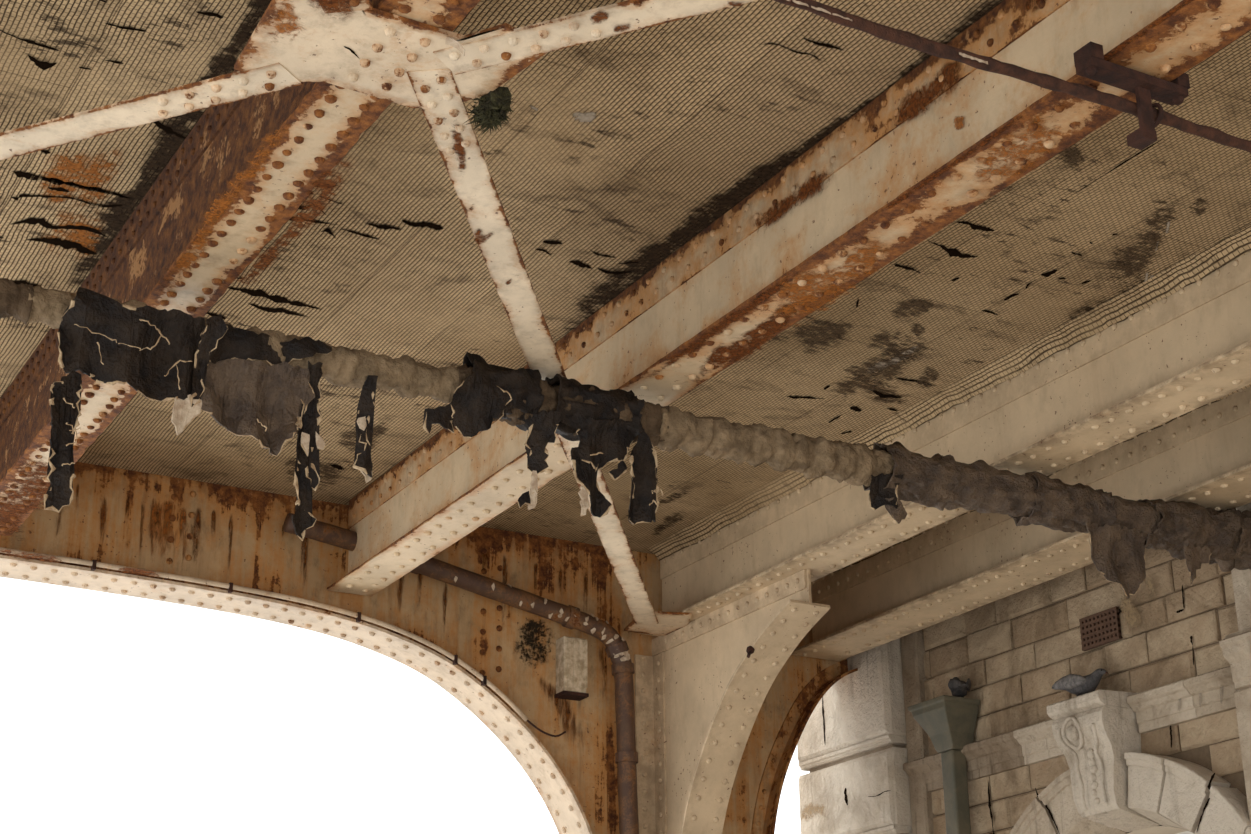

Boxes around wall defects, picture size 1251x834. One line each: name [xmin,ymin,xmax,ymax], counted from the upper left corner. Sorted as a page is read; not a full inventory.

rust [269,0,300,37]
rust [310,0,353,15]
rust [895,61,961,123]
rust [452,124,466,169]
leakage [564,0,1002,333]
rust [887,113,1061,208]
rust [755,172,830,230]
leakage [1066,195,1207,324]
rust [653,241,885,381]
leakage [772,304,852,354]
leakage [832,300,939,404]
leakage [516,619,551,665]